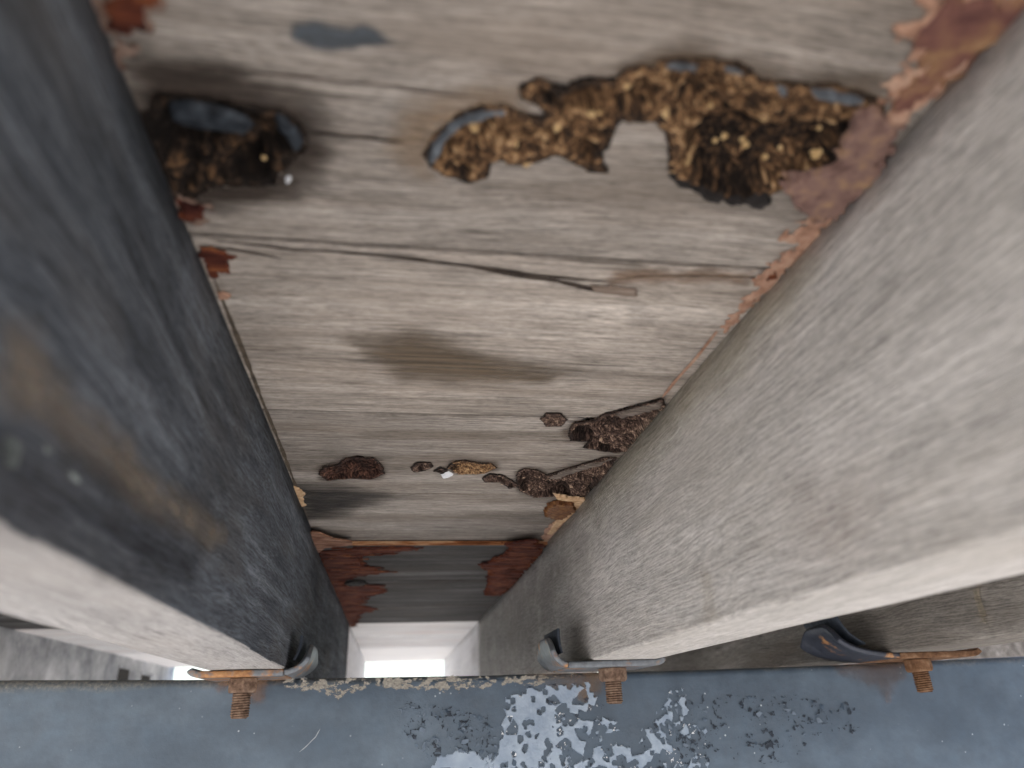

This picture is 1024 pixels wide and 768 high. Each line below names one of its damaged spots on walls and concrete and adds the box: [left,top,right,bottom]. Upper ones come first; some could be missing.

damp [292,22,390,51]
spalling [168,100,254,134]
spalling [275,113,304,152]
spalling [427,110,506,164]
spalling [811,88,864,105]
crack [197,238,755,297]
damp [353,330,555,382]
peeling [398,682,859,768]